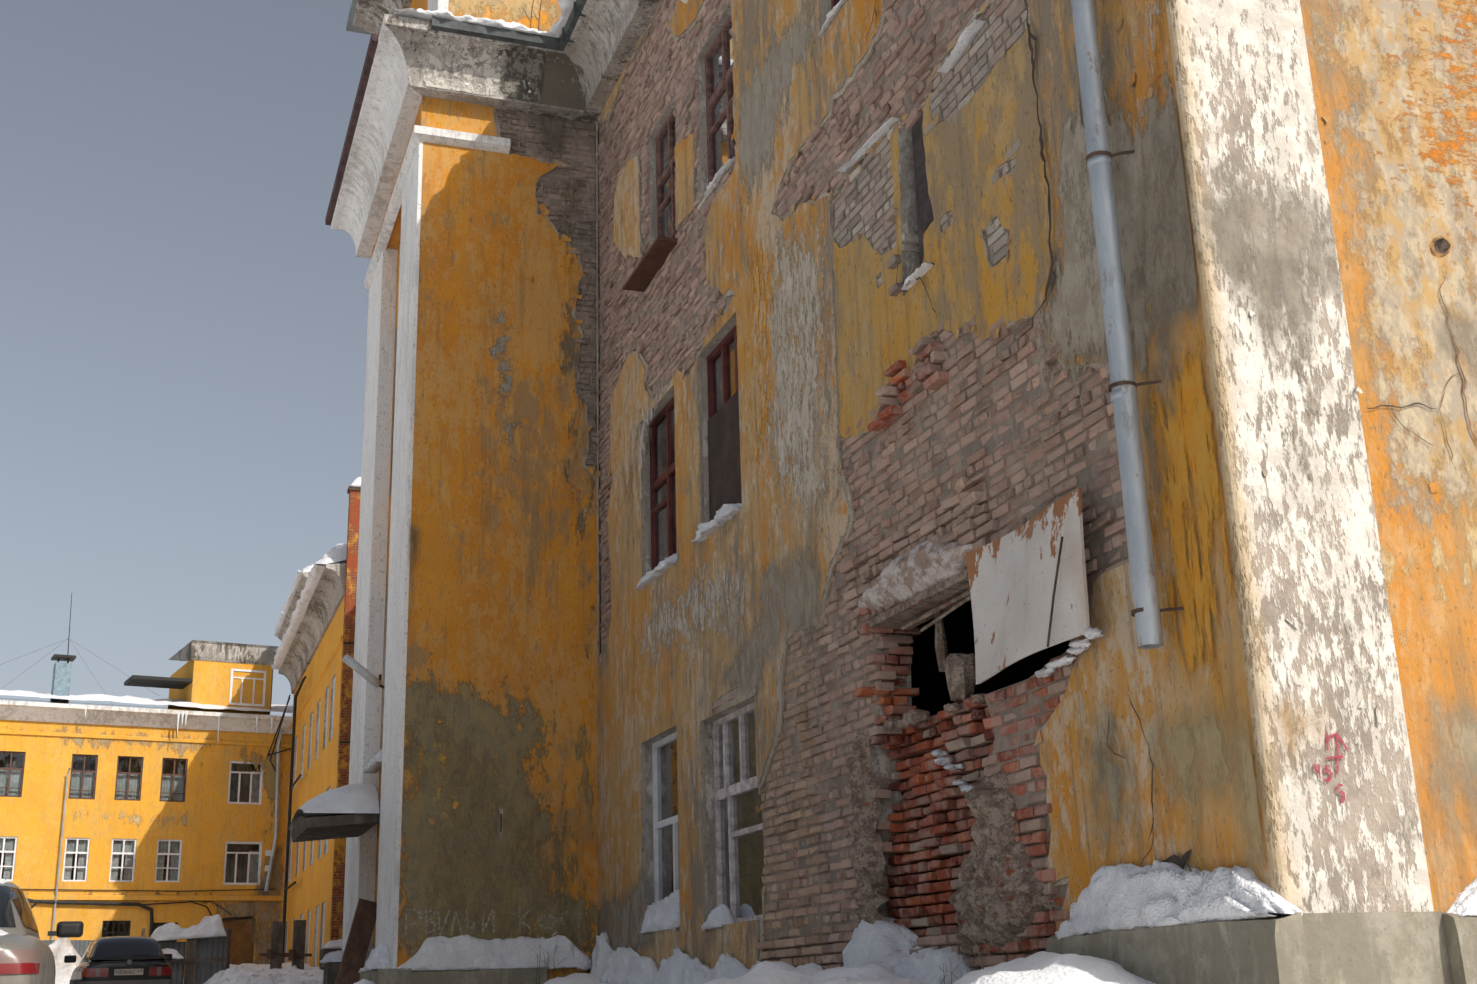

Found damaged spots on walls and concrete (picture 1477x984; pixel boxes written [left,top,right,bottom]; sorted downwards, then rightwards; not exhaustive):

flaking render [422,0,1127,971]
crack [1024,0,1056,319]
leakage [1034,94,1110,416]
leakage [1104,73,1198,380]
leakage [1211,177,1340,338]
crack [1367,271,1477,466]
leakage [397,670,653,972]
leakage [1155,713,1263,859]
leakage [1404,790,1418,842]